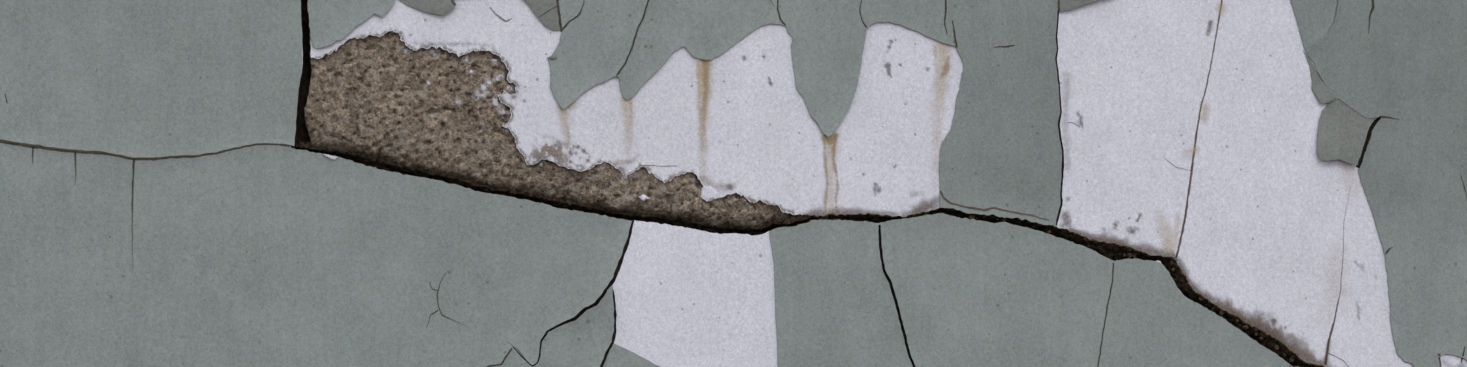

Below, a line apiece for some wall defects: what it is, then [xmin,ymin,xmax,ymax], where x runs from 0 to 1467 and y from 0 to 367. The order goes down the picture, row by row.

corrosion [699,60,709,133]
crack [0,140,295,217]
peeling [302,0,963,367]
crack [291,0,1323,367]
peeling [1052,0,1414,367]
crack [1356,116,1394,168]
crack [1324,287,1349,367]
peeling [1440,354,1467,367]